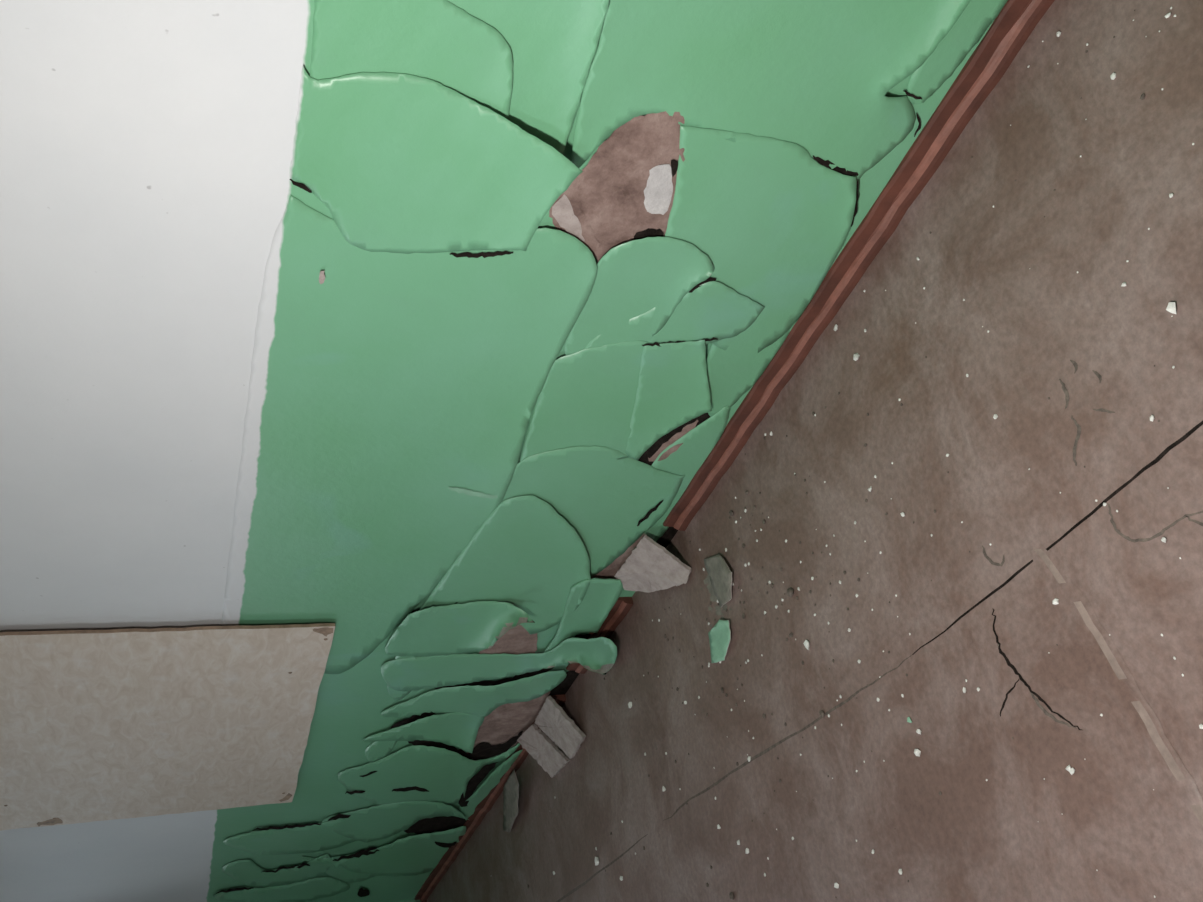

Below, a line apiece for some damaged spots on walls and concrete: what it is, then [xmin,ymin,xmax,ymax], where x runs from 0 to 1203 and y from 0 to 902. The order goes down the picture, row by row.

peeling [214,0,1008,902]
crack [556,421,1203,902]
crack [1059,360,1115,466]